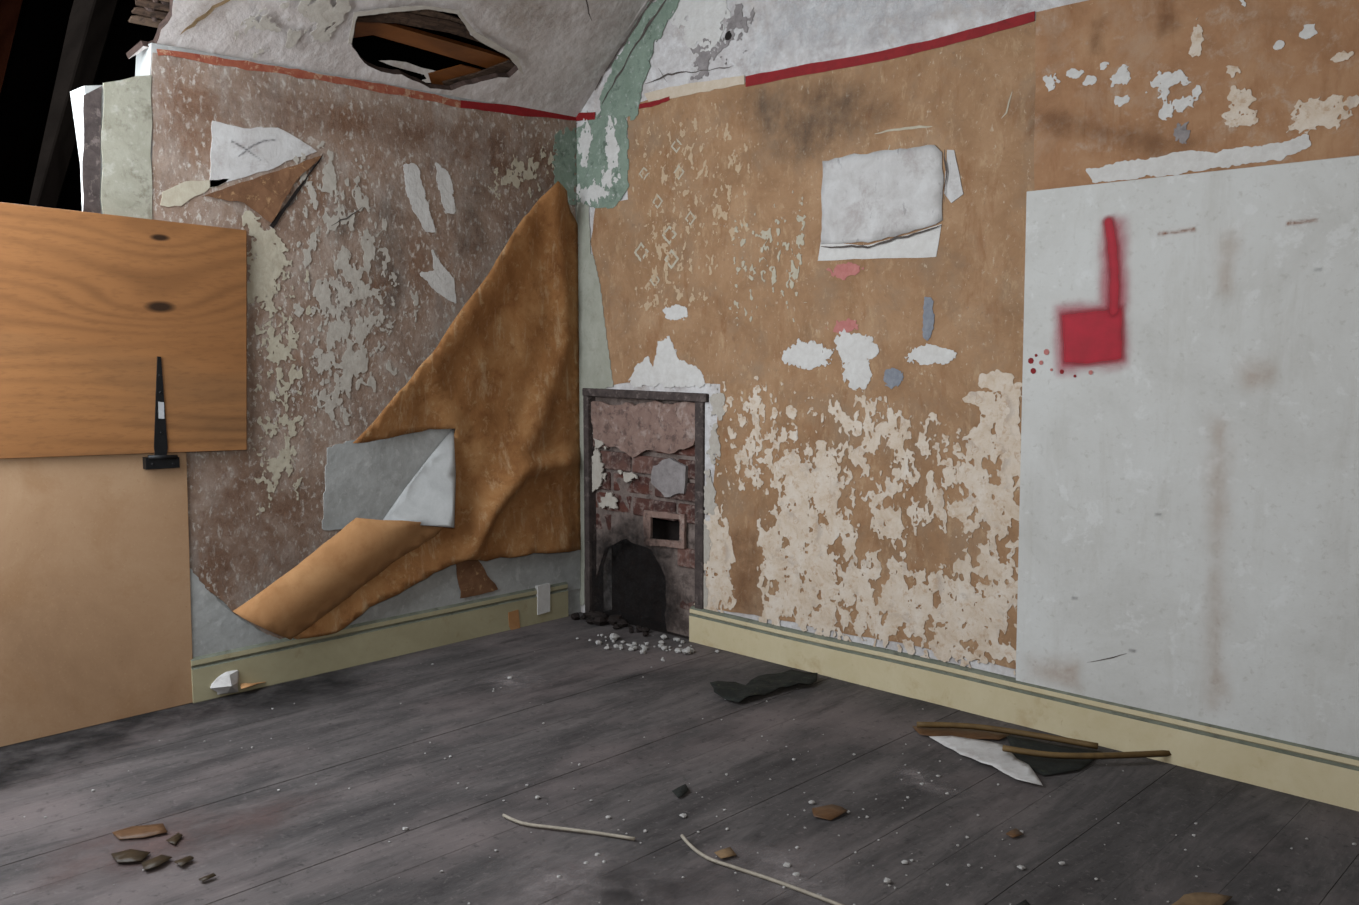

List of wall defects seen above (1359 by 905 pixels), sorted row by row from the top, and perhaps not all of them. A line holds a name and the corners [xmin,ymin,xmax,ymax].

crack [180,0,230,35]
peeling [1188,19,1204,57]
peeling [1273,24,1317,50]
peeling [1330,50,1354,62]
peeling [1043,62,1131,107]
peeling [1086,65,1359,183]
peeling [160,121,456,530]
peeling [349,0,1022,676]